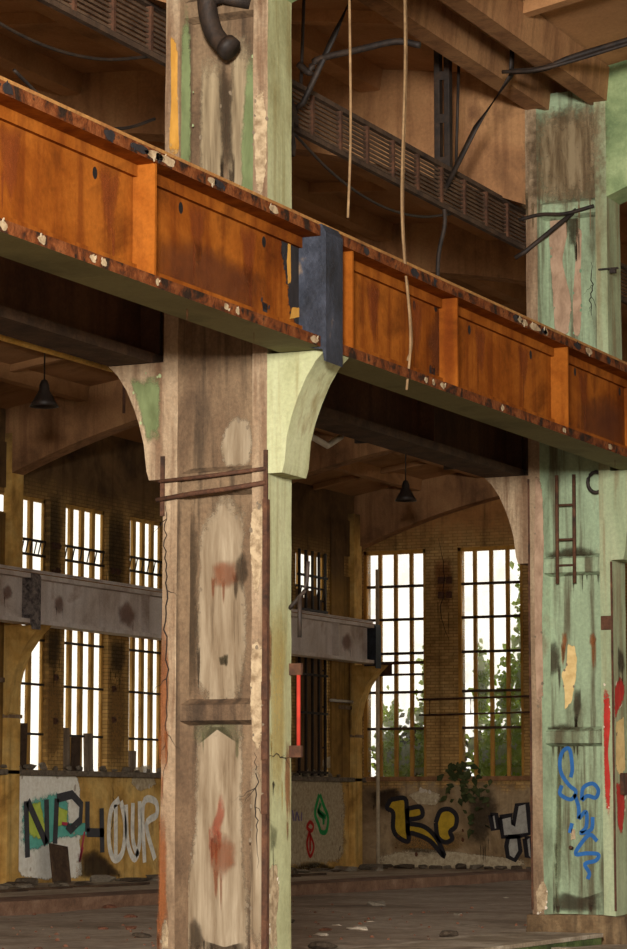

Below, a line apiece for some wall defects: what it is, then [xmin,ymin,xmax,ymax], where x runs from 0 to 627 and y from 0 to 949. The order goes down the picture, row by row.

corrosion [430,321,439,375]
peeling [132,372,161,439]
peeling [221,417,252,466]
peeling [562,644,577,709]